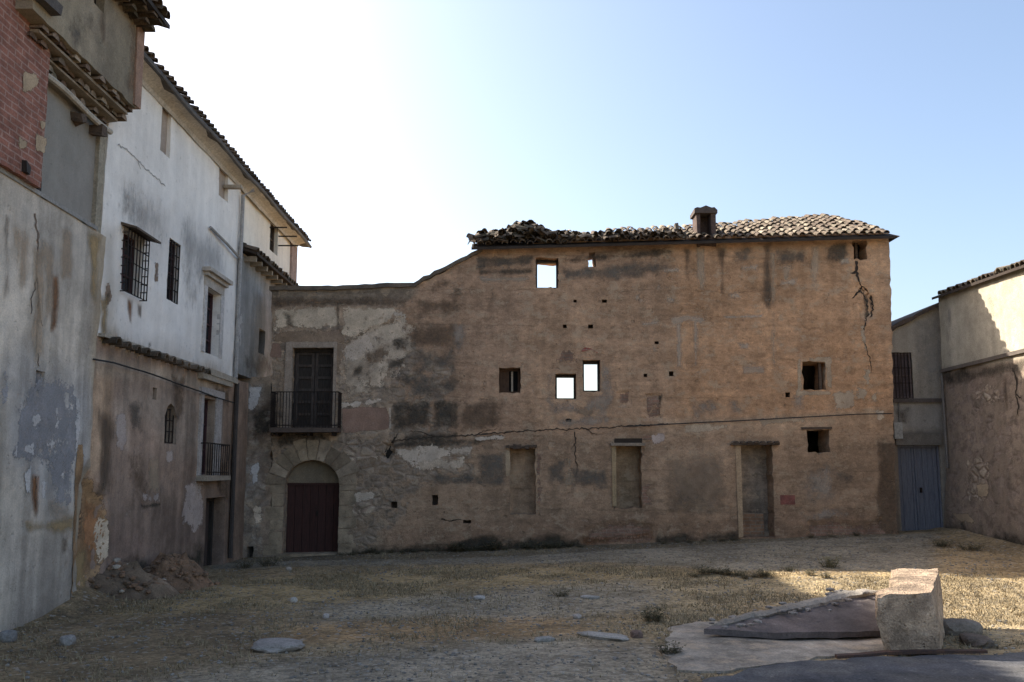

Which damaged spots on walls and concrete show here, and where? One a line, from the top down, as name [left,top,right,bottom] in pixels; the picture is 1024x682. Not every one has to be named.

crack [31,213,44,365]
crack [852,261,874,372]
flaking render [274,304,511,476]
peeling [13,376,109,598]
flaking render [182,481,204,533]
flaking render [352,490,397,516]
crack [394,423,668,476]